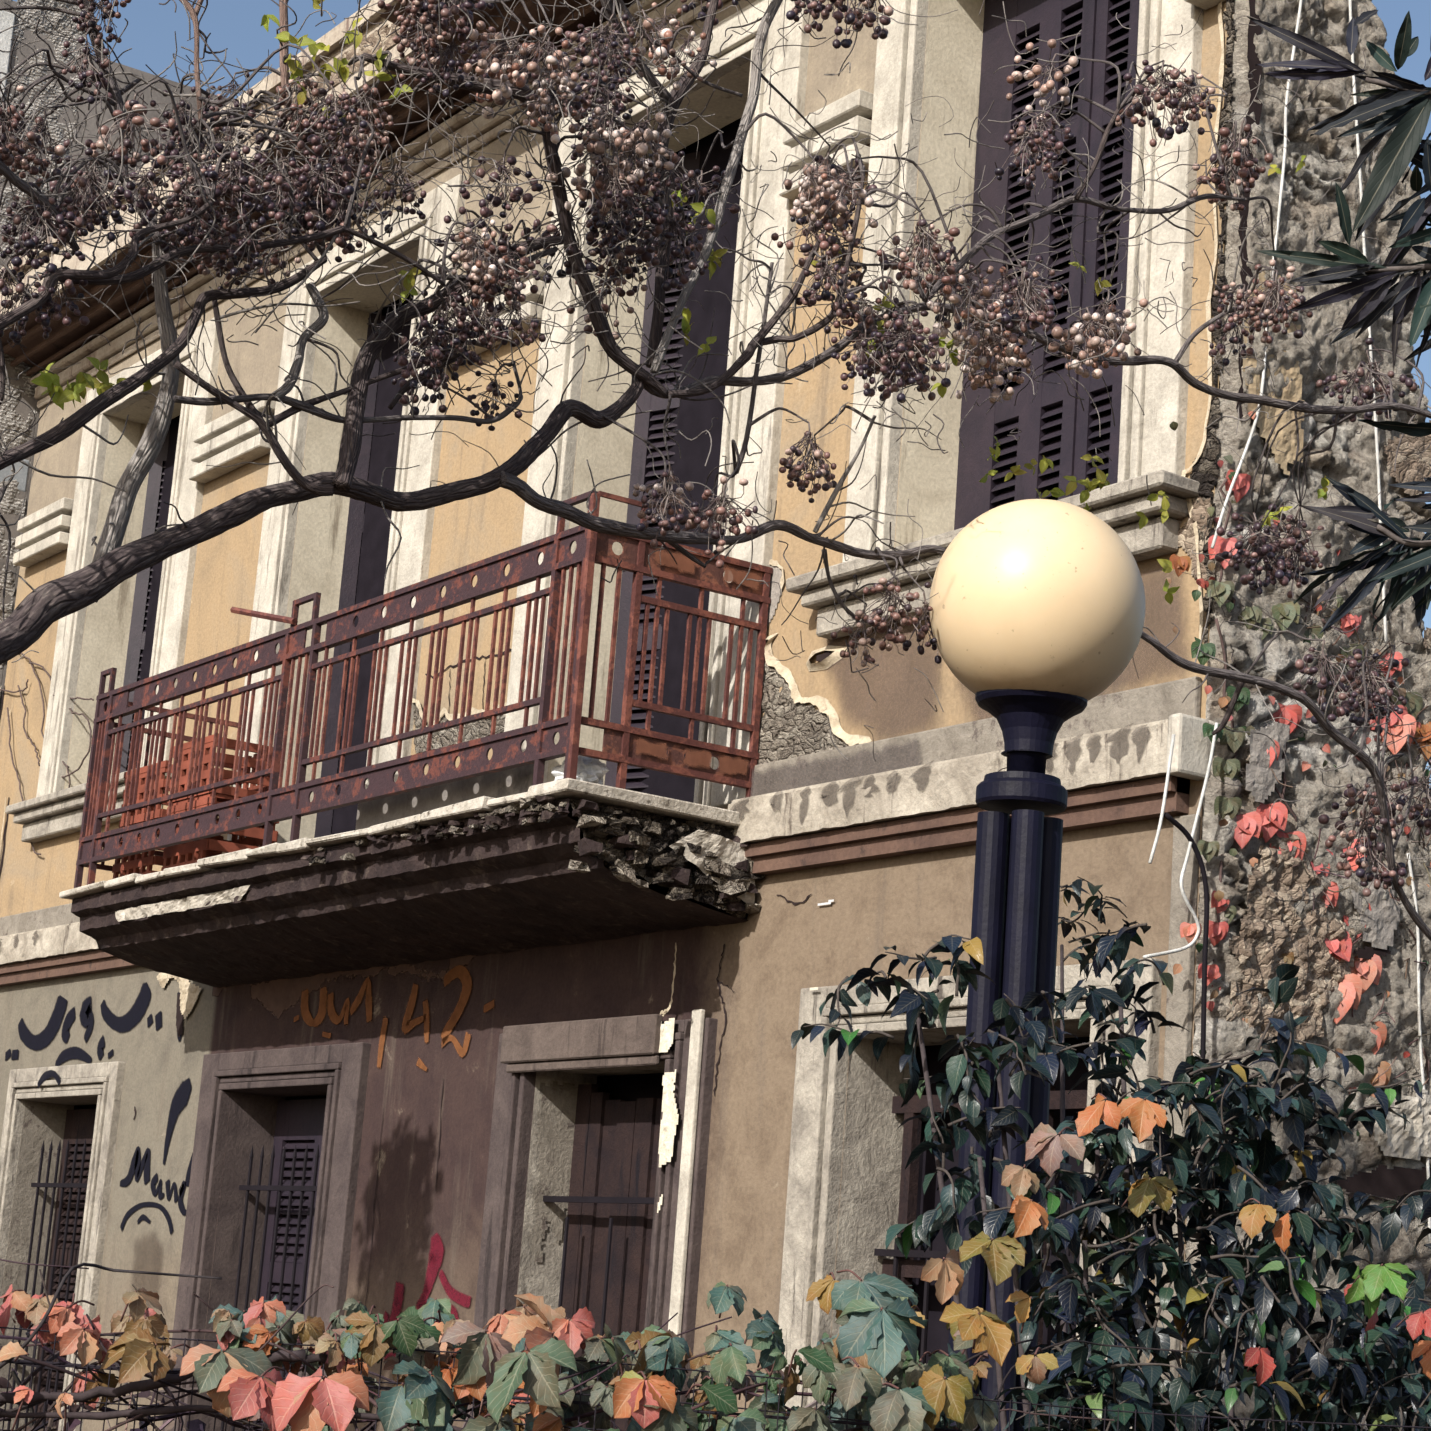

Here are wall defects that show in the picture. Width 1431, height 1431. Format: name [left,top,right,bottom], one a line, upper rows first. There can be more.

flaking render [1176,0,1236,644]
spalling [1384,420,1431,496]
corrosion [655,549,695,574]
corrosion [723,567,760,590]
flaking render [757,559,872,765]
corrosion [635,738,749,775]
leakage [1046,724,1150,772]
spalling [300,796,765,914]
crack [660,943,677,1016]
peeling [659,1018,675,1052]
crack [713,944,734,1096]
peeling [658,1069,679,1167]